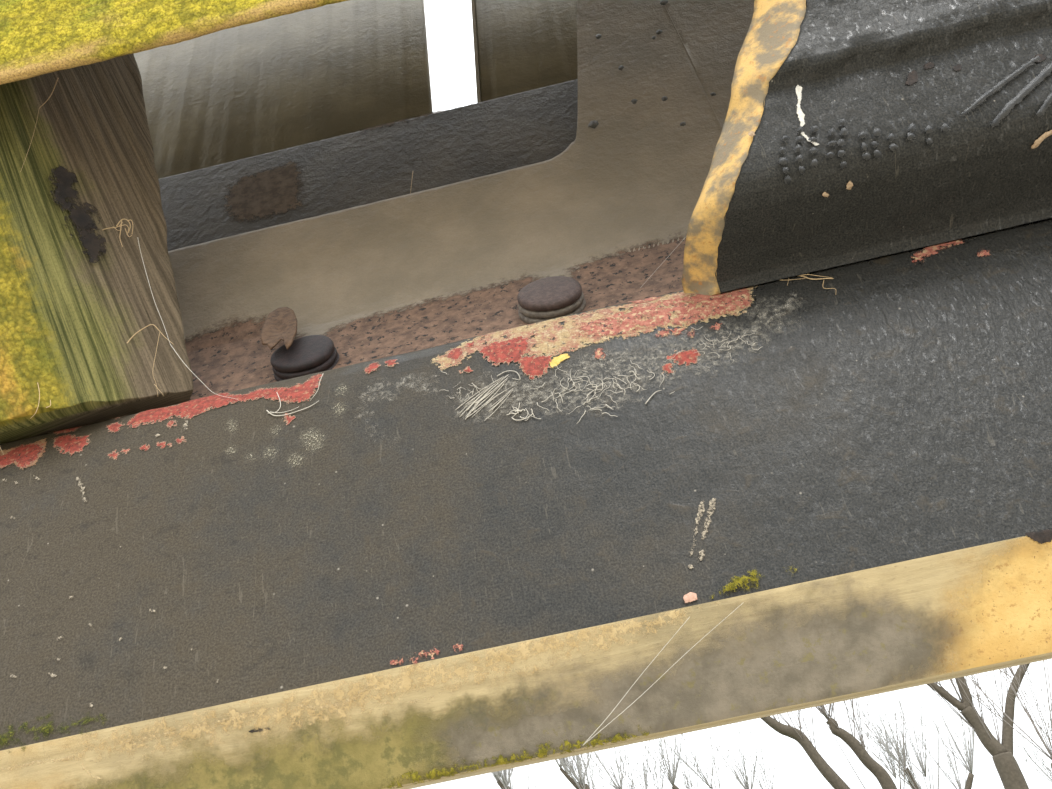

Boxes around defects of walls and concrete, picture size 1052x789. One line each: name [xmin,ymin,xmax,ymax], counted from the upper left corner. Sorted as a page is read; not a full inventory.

peeling [432,287,754,380]
peeling [107,374,323,459]
leakage [72,600,950,789]